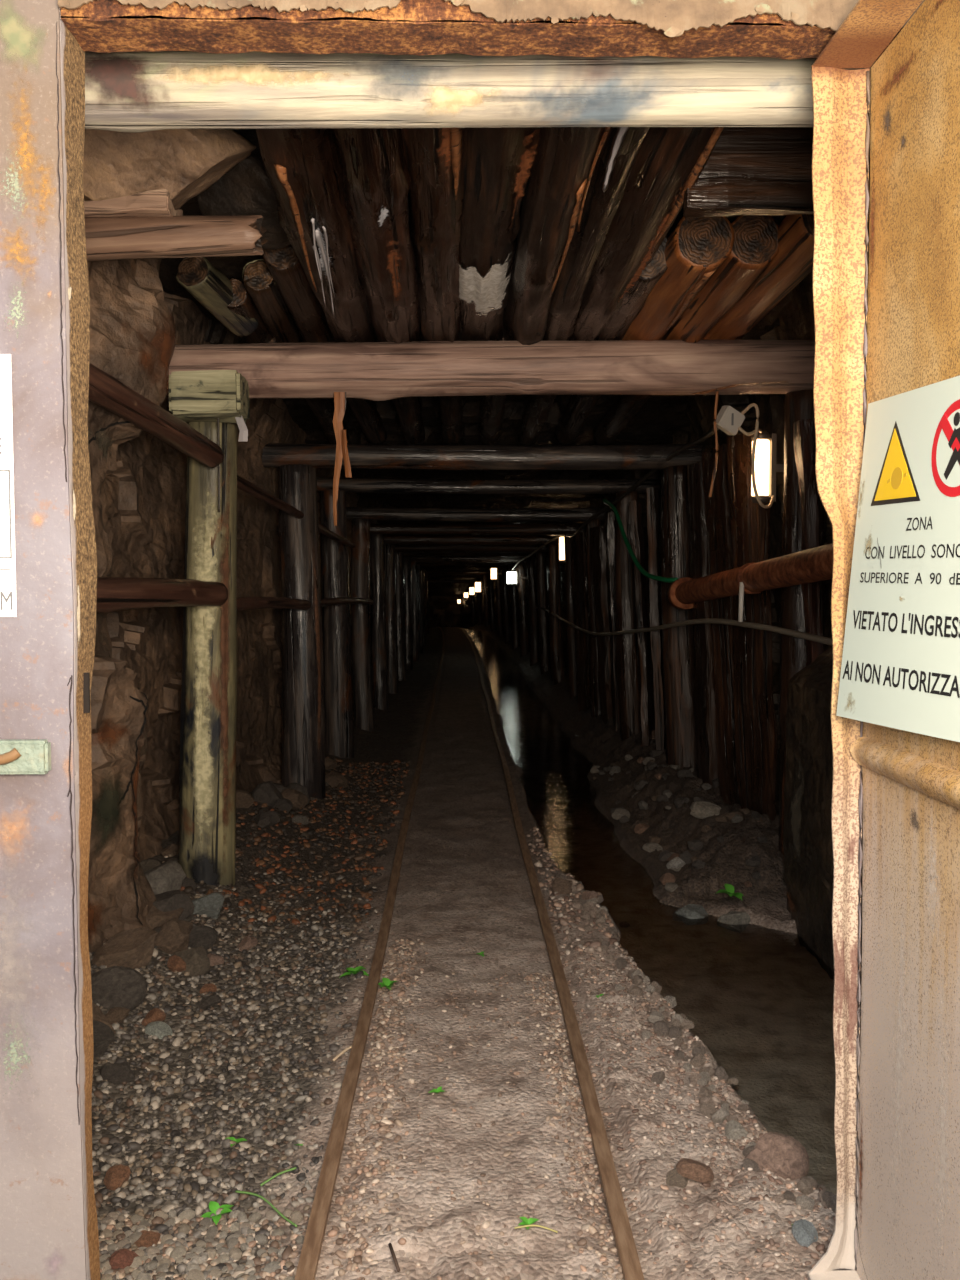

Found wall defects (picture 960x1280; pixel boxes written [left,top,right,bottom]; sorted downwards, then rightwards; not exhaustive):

peeling [57,0,93,9]
peeling [117,0,401,14]
peeling [444,0,859,37]
corrosion [15,100,50,209]